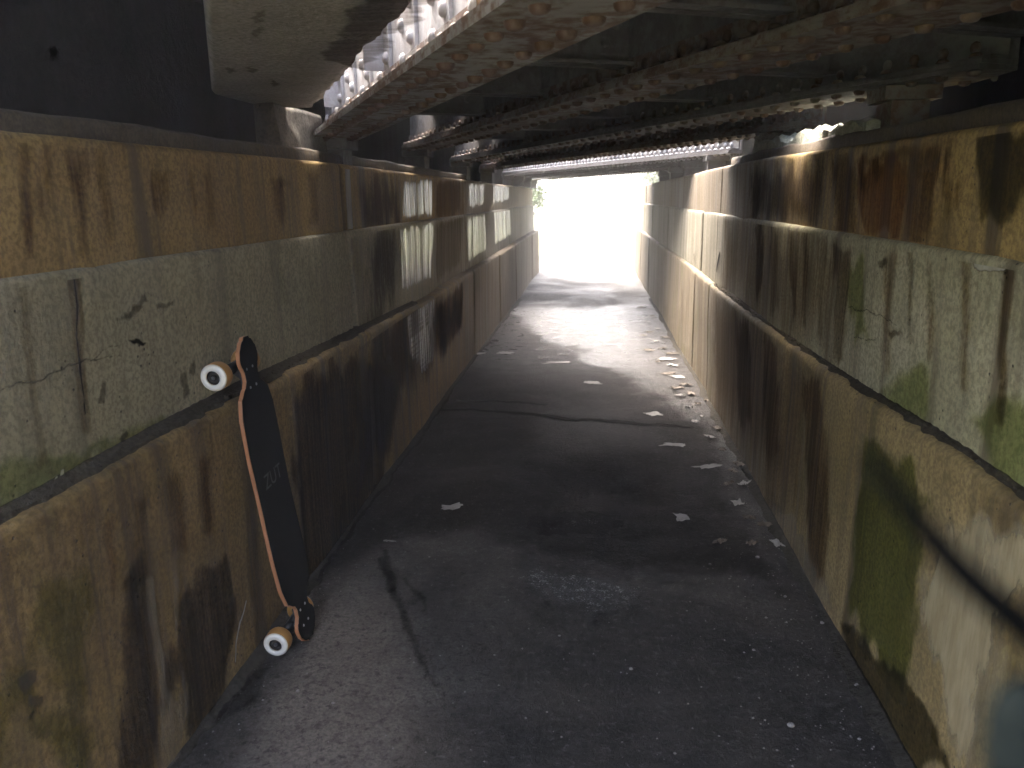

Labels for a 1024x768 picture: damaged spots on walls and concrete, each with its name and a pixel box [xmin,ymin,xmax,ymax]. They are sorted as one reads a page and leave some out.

leakage [345,169,435,311]
leakage [978,133,1024,222]
crack [2,279,112,414]
leakage [292,300,462,579]
crack [440,400,690,428]